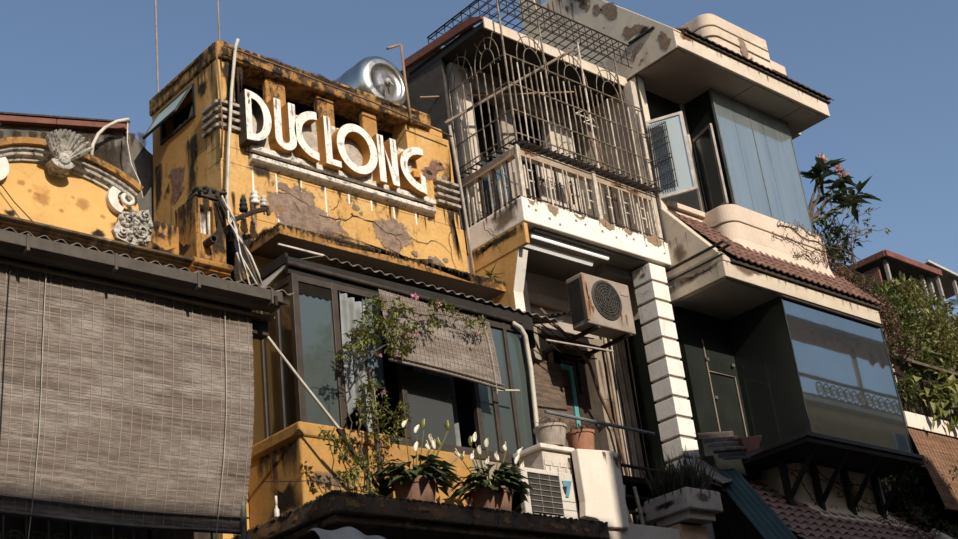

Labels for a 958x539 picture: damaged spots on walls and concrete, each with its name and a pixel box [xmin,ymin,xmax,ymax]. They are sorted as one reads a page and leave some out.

peeling [579,2,671,62]
damp [158,46,364,127]
spalling [166,166,185,202]
peeling [267,182,350,241]
damp [140,134,506,286]
crack [268,192,457,267]
peeling [372,217,449,267]
damp [259,439,300,518]